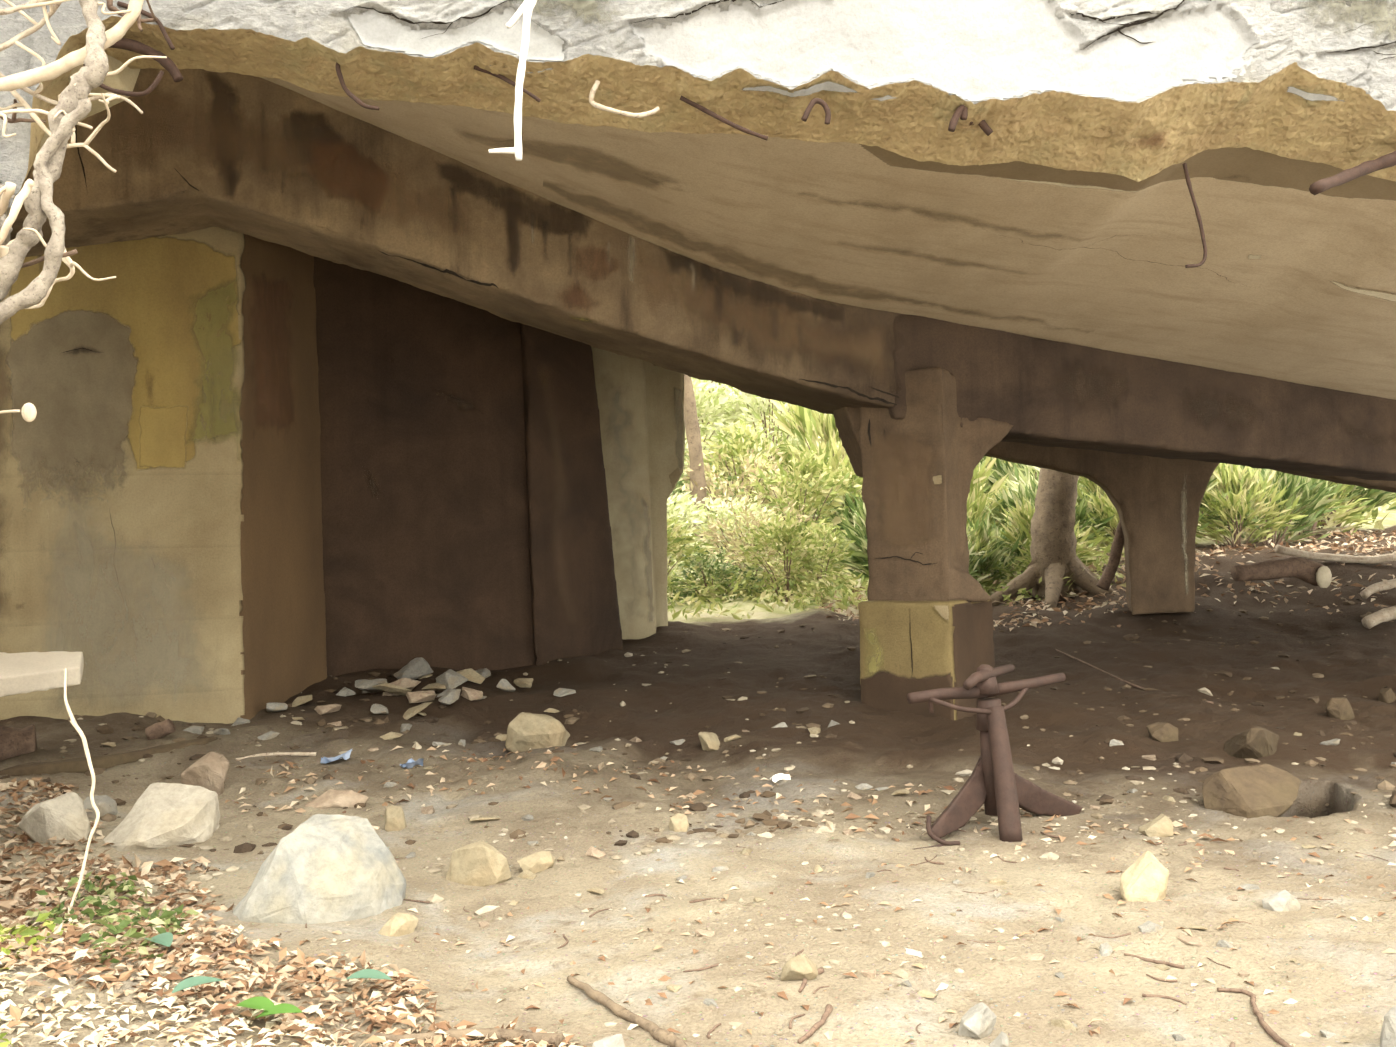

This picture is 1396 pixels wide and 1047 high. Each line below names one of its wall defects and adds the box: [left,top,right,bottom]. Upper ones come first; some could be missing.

crack [1070,0,1212,48]
crack [1327,21,1396,60]
spalling [20,0,1396,268]
water stain [10,237,241,469]
crack [875,552,935,565]